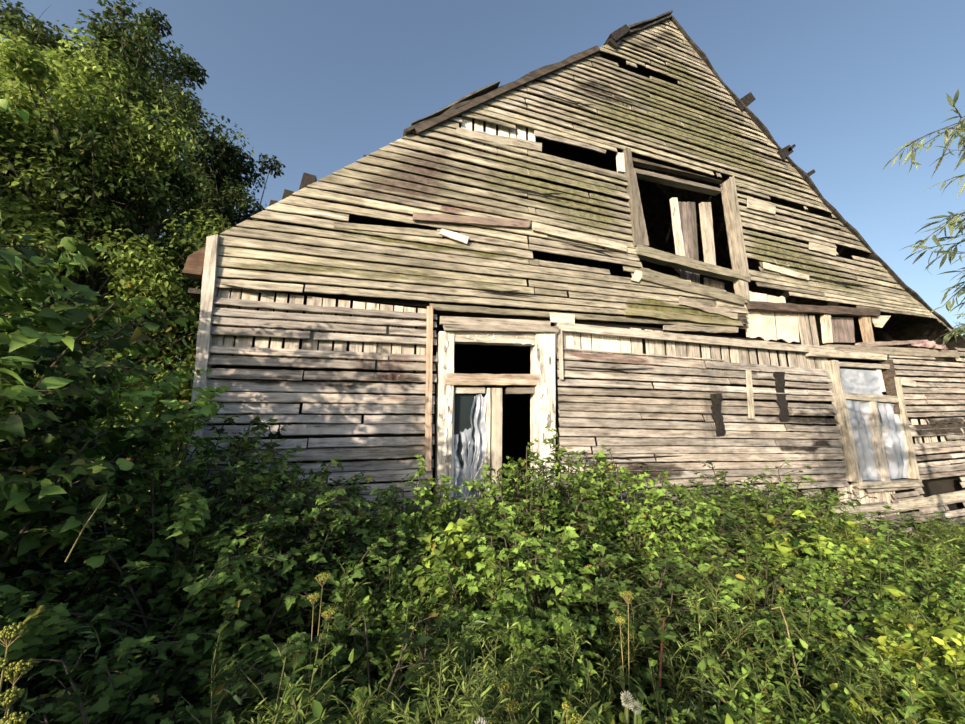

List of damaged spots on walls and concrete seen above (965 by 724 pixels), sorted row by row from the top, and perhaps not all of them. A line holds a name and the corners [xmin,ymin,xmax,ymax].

damp [570,62,779,186]
damp [493,162,616,229]
damp [628,299,748,328]